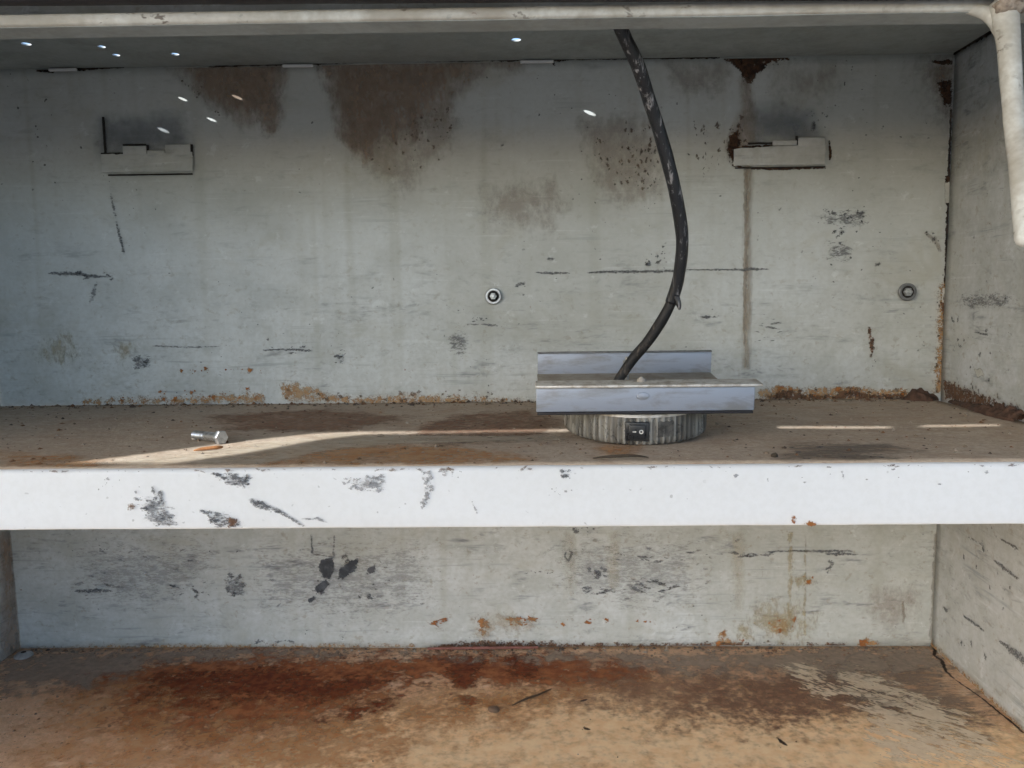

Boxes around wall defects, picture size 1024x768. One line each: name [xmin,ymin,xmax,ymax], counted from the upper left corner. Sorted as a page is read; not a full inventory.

corrosion [724,56,790,101]
corrosion [932,59,953,107]
corrosion [693,114,832,177]
corrosion [933,282,1019,421]
corrosion [757,385,909,399]
corrosion [82,382,557,472]
peeling [211,472,253,487]
peeling [128,487,177,526]
peeling [308,555,376,603]
corrosion [57,616,900,749]